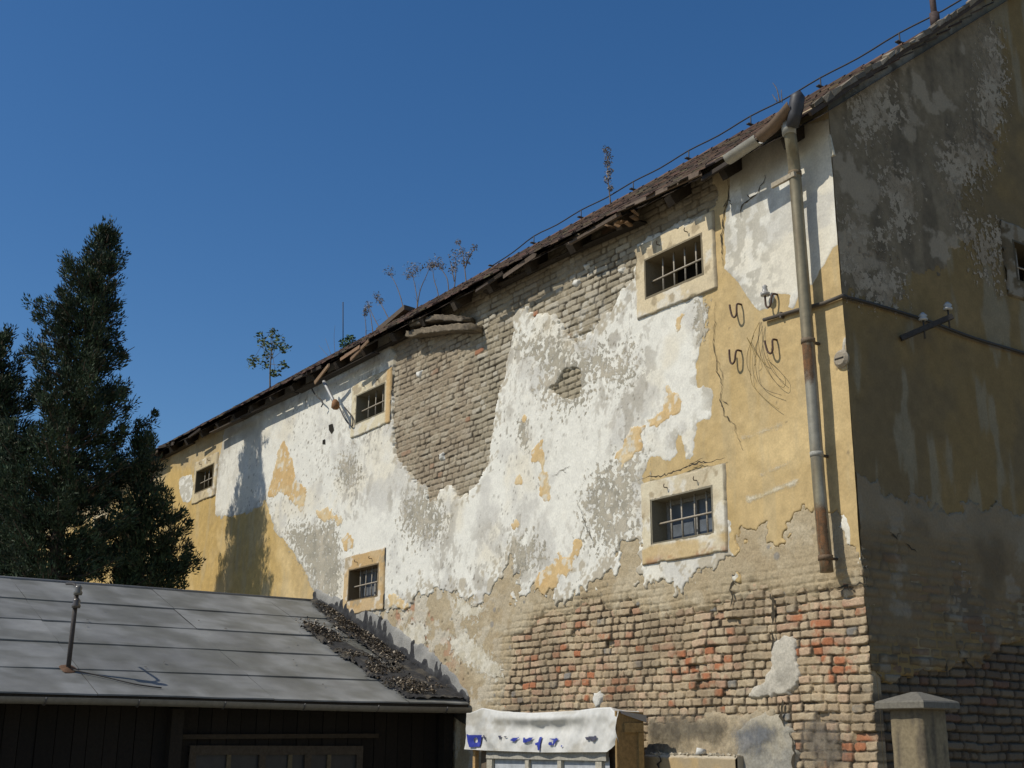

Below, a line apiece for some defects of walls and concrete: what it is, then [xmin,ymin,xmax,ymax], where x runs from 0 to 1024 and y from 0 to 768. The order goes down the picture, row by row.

peeling [215,1,1024,768]
crack [638,307,743,481]
corrosion [802,343,814,380]
corrosion [815,507,830,565]